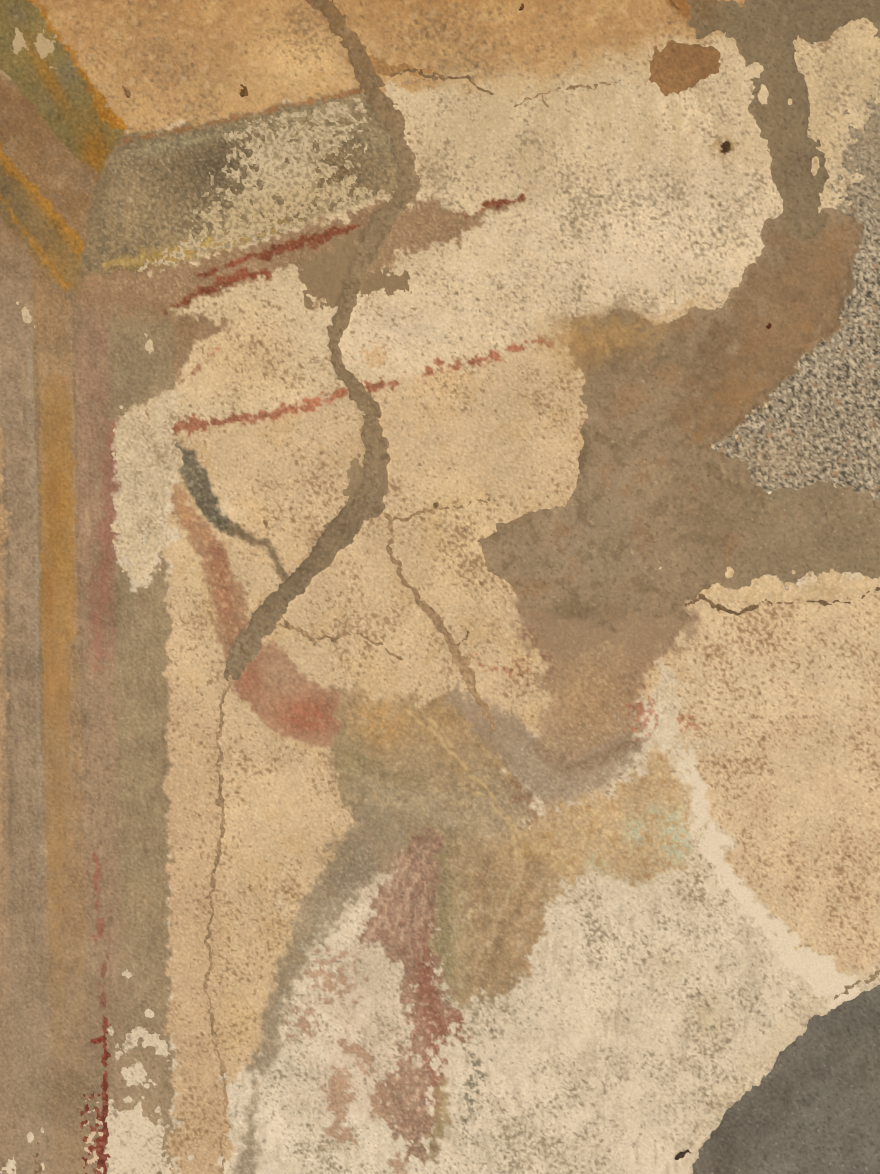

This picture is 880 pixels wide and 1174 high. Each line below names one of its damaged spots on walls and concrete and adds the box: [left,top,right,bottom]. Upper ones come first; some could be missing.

spalling [714,83,880,500]
crack [203,0,621,1174]
crack [684,587,880,616]